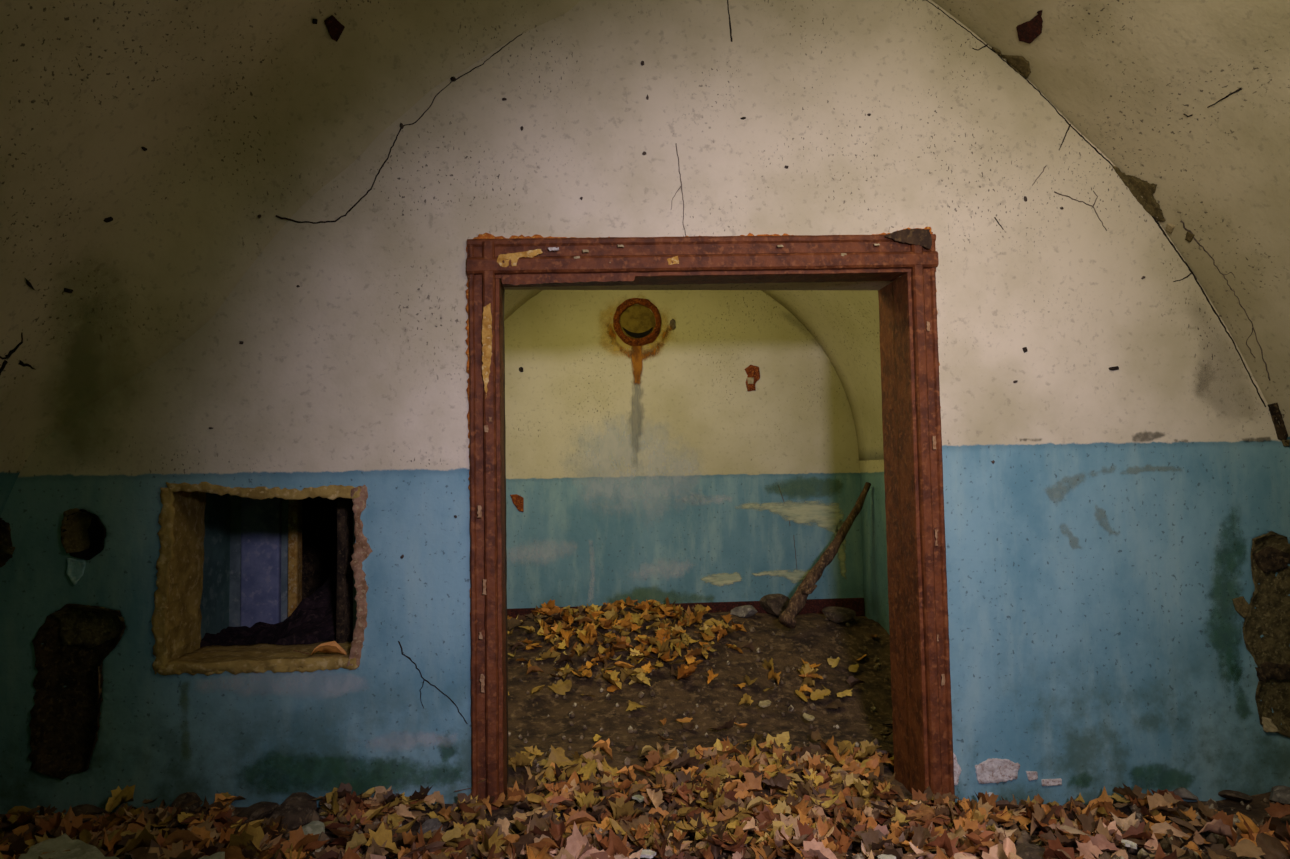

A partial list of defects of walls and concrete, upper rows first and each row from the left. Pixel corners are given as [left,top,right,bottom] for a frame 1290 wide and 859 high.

crack [276,34,522,224]
crack [671,143,686,236]
crack [926,0,1114,231]
crack [0,332,36,375]
corrosion [607,325,672,446]
crack [1152,216,1270,407]
spalling [0,518,15,567]
spalling [61,508,106,585]
spalling [28,603,126,780]
crack [398,641,468,724]
spalling [1233,531,1290,738]
peeling [953,753,1062,786]